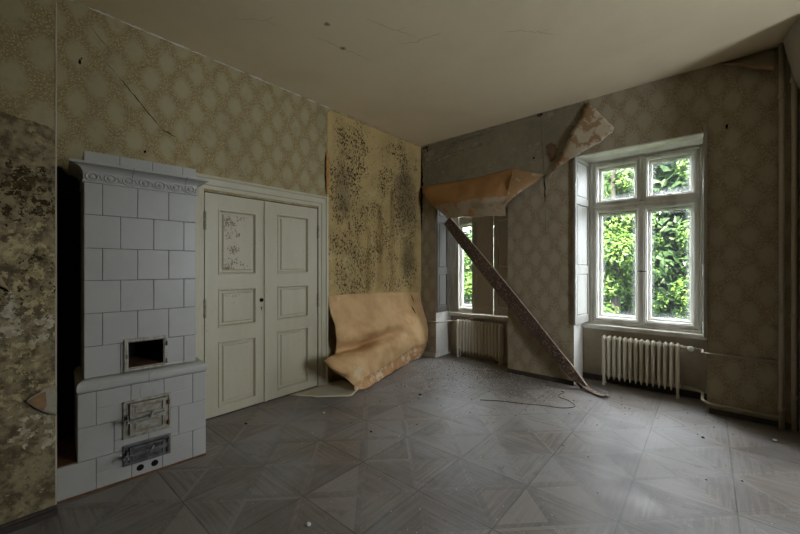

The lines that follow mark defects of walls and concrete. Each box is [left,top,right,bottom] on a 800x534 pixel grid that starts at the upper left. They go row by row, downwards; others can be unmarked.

crack [90,26,173,136]
flaking render [88,7,582,303]
peeling [0,111,56,525]